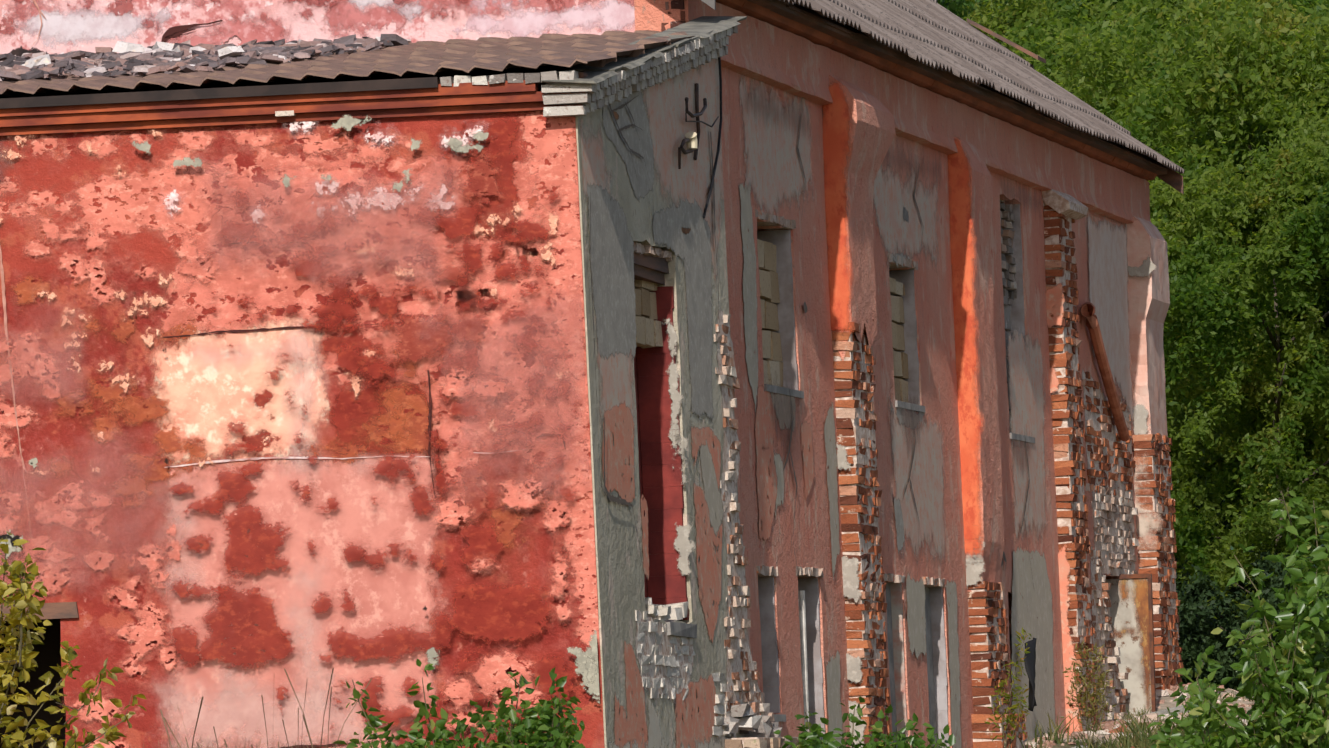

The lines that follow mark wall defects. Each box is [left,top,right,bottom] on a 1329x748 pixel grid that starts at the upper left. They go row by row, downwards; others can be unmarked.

peeling [0,0,159,57]
peeling [283,0,591,37]
spalling [661,0,686,32]
spalling [1000,199,1017,305]
peeling [1046,283,1065,328]
flaking render [0,57,866,748]
peeling [873,138,985,748]
peeling [1082,217,1160,733]
flaking render [1008,330,1087,748]